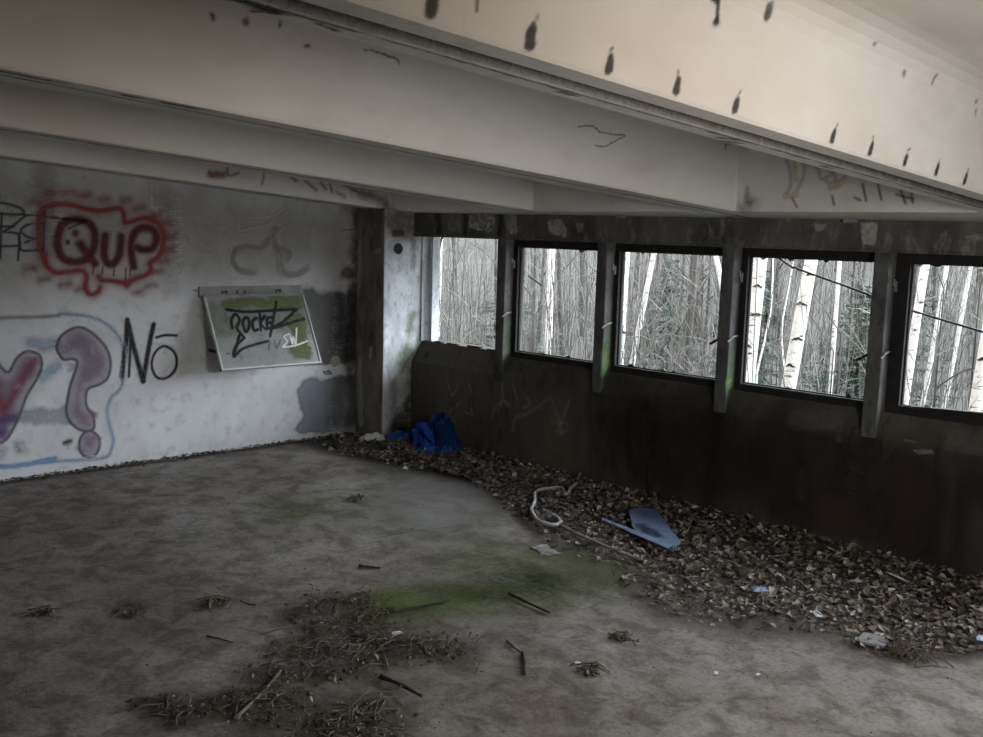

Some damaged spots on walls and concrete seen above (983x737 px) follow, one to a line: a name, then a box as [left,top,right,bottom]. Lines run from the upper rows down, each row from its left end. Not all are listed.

leakage [0,184,342,259]
leakage [296,208,358,433]